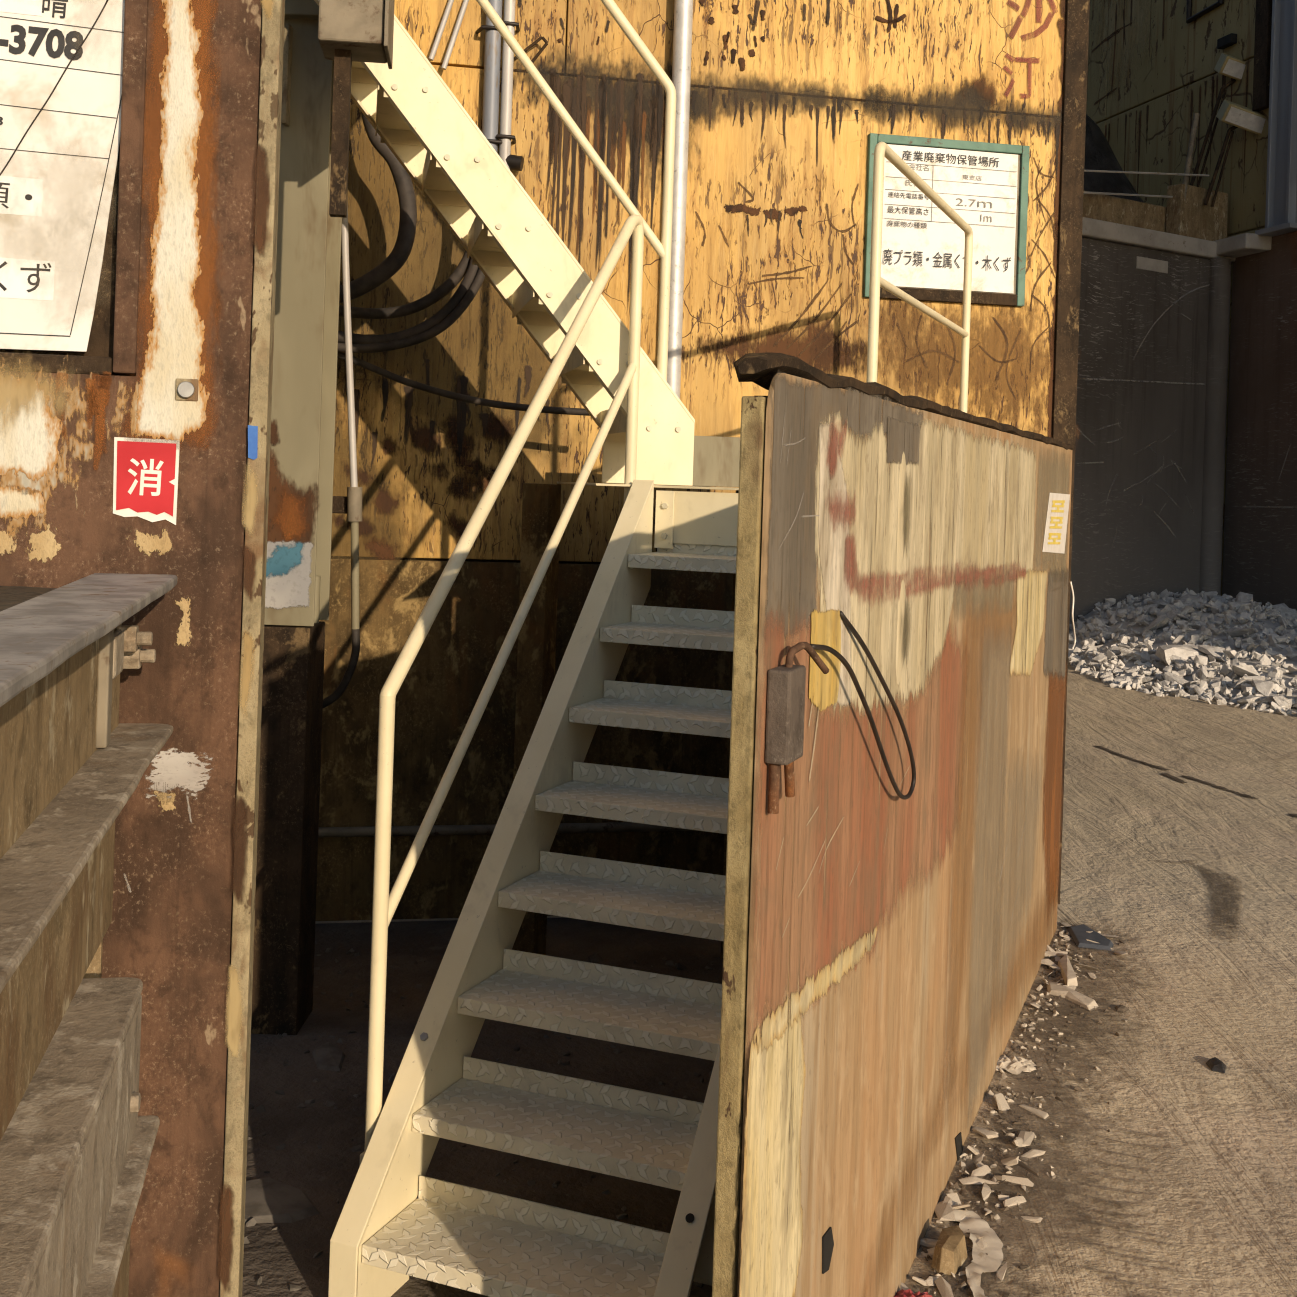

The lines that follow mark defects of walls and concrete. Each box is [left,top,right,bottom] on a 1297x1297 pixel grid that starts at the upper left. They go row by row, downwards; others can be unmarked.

peeling [0,0,217,563]
damp [340,106,400,285]
damp [338,178,466,335]
damp [513,55,672,264]
damp [689,74,1063,177]
damp [331,276,558,560]
peeling [175,596,192,646]
peeling [154,790,176,812]